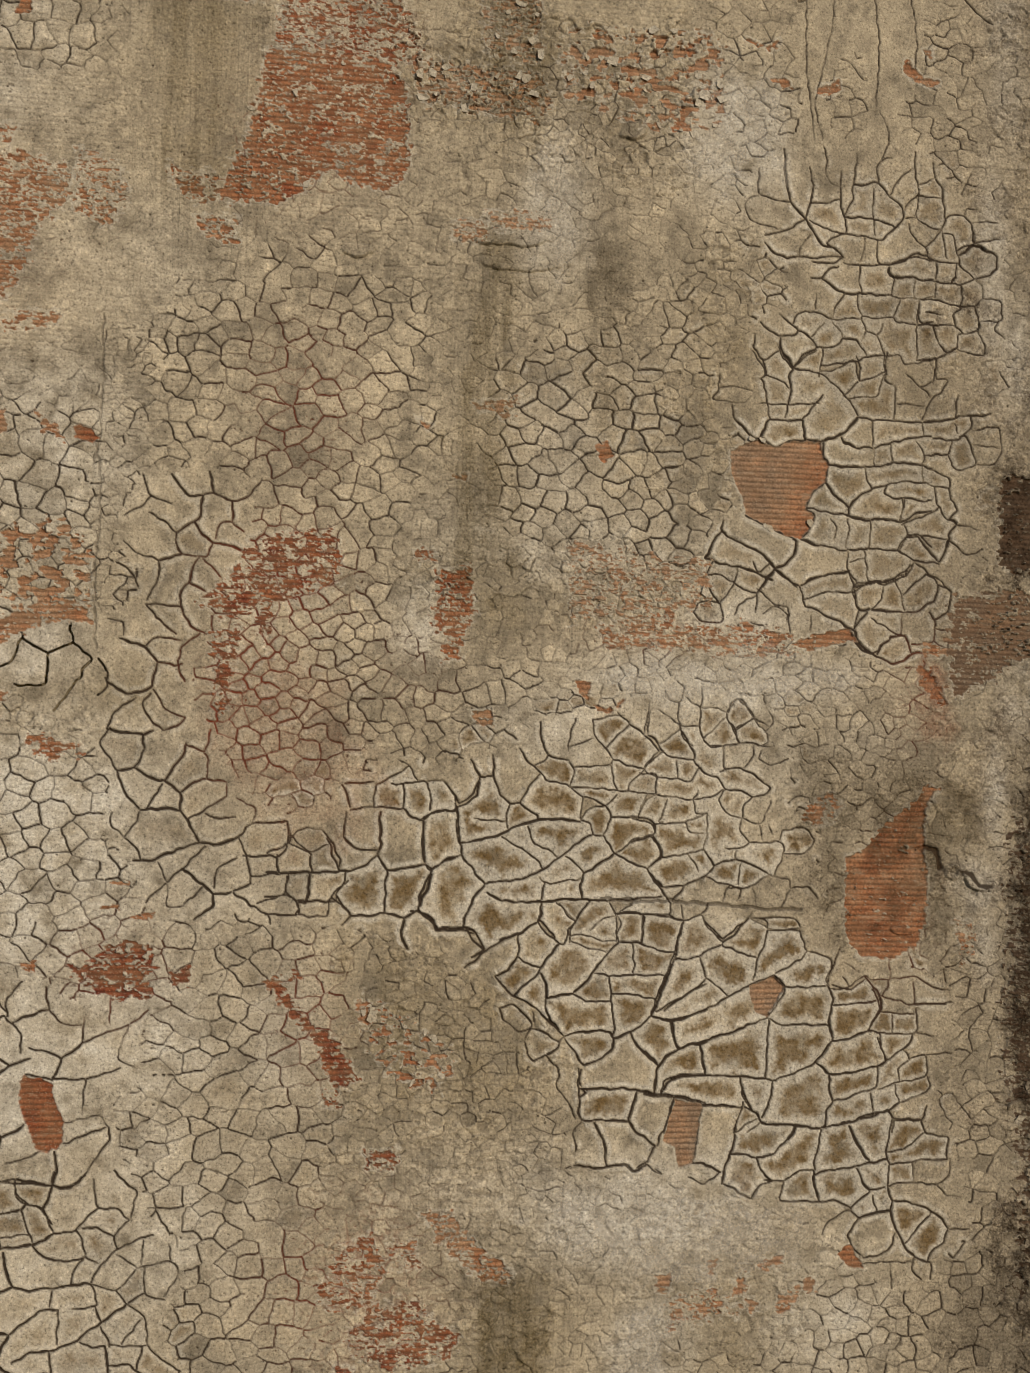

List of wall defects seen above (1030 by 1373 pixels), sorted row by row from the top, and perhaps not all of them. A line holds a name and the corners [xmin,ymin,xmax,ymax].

peeling [166,0,729,244]
crack [477,0,1017,670]
crack [0,694,24,722]
peeling [0,517,95,644]
crack [0,312,173,649]
peeling [194,528,342,715]
peeling [730,436,829,541]
crack [100,249,1028,1373]
peeling [844,785,941,959]
peeling [18,1075,64,1153]
crack [0,718,181,1373]
peeling [67,939,192,1002]